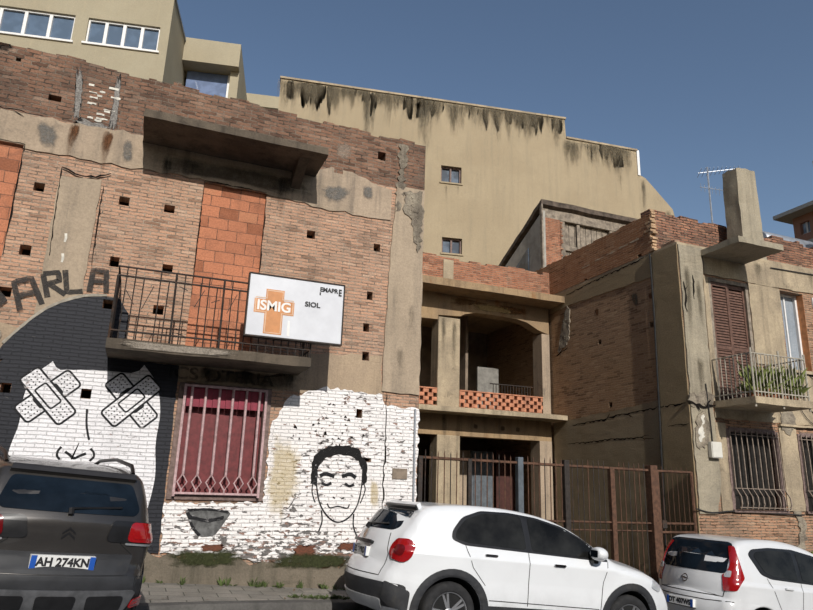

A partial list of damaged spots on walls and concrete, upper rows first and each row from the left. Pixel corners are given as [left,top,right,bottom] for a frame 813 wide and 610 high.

water stain [39,125,56,145]
spalling [74,68,122,130]
water stain [124,142,132,160]
water stain [281,83,473,126]
water stain [484,108,537,133]
water stain [590,145,629,166]
spalling [395,144,425,253]
peeling [292,397,369,446]
crack [570,400,716,444]
flaking render [688,390,715,449]
peeling [293,545,316,555]